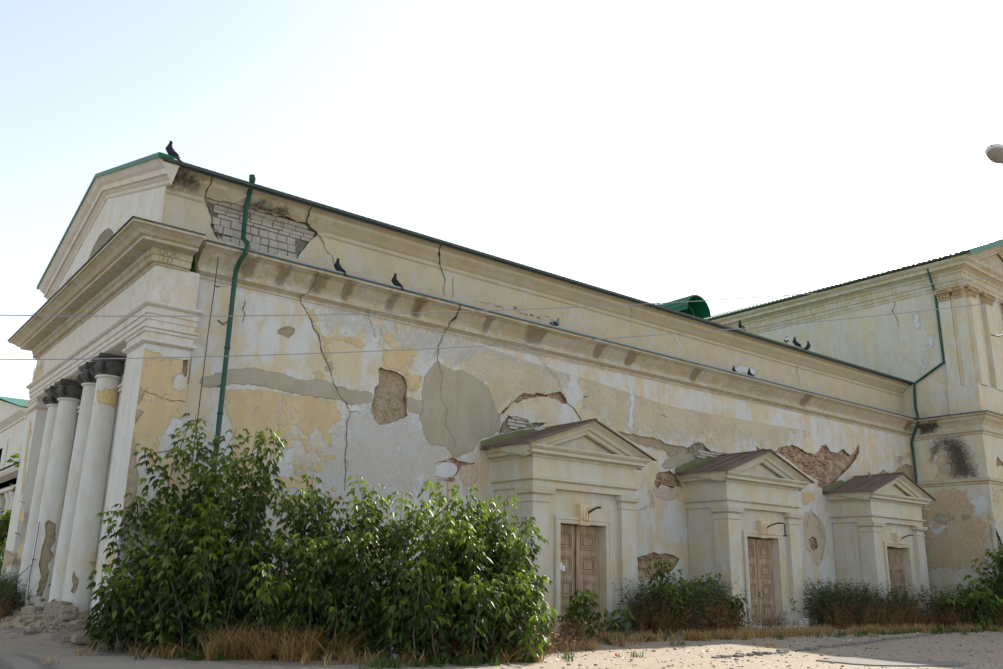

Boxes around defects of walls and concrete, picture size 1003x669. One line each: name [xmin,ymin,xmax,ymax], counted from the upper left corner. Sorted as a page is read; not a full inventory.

flaking render [205,197,317,259]
peeling [122,349,192,531]
crack [300,207,360,491]
flaking render [371,324,422,425]
crack [434,245,461,446]
flaking render [499,416,547,434]
flaking render [513,392,568,404]
flaking render [618,431,727,460]
water stain [918,421,975,479]
flaking render [756,444,859,566]
peeling [922,486,1003,574]
peeling [2,521,101,644]